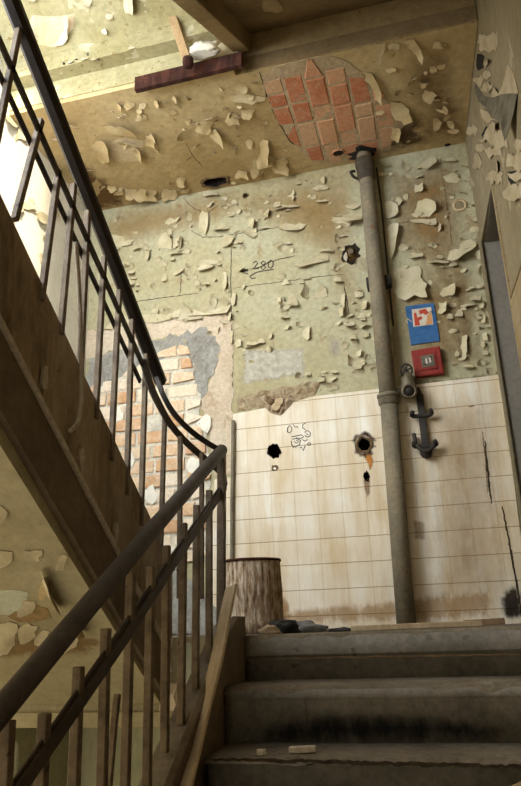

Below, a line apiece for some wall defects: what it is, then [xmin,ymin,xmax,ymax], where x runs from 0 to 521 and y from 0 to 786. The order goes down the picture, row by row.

peeling [123,0,133,15]
peeling [63,43,100,65]
flaking render [86,31,521,553]
crack [482,432,521,614]
peeling [0,572,61,656]
leakage [502,589,520,617]
leakage [266,717,497,741]